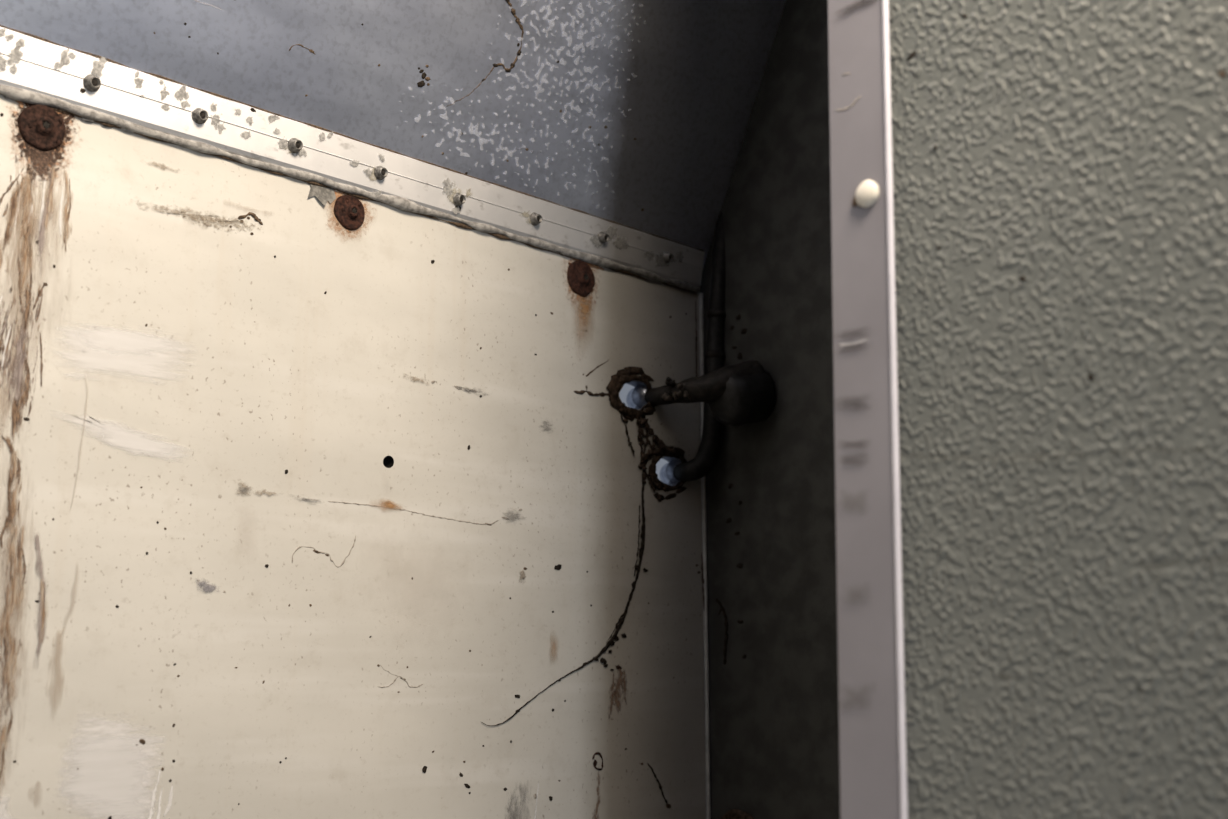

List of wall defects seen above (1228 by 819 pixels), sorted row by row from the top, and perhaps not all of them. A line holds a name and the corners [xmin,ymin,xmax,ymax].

rust [0,101,76,779]
rust [328,154,385,237]